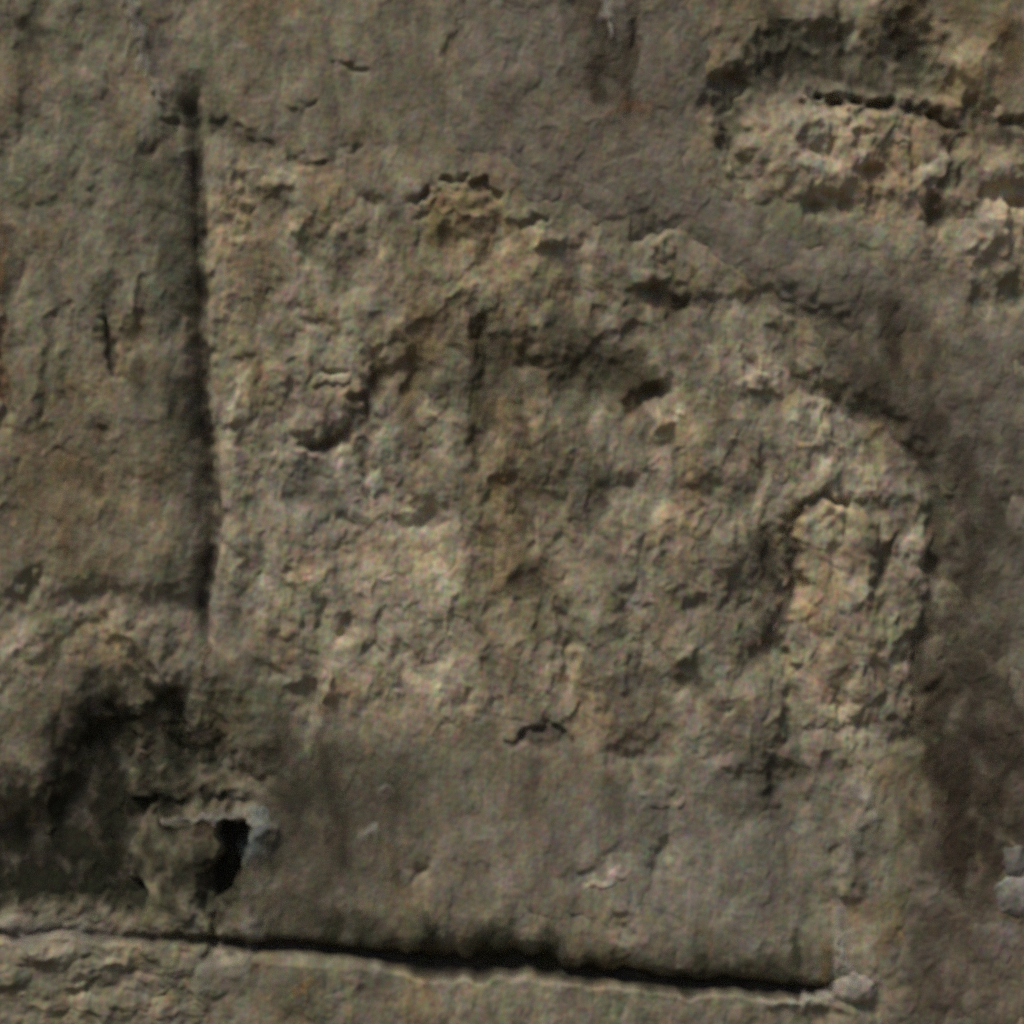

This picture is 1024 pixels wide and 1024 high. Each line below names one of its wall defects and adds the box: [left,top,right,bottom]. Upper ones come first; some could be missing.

crack [191,121,203,191]
crack [194,216,205,244]
crack [196,270,207,299]
crack [192,333,221,619]
crack [217,939,827,999]